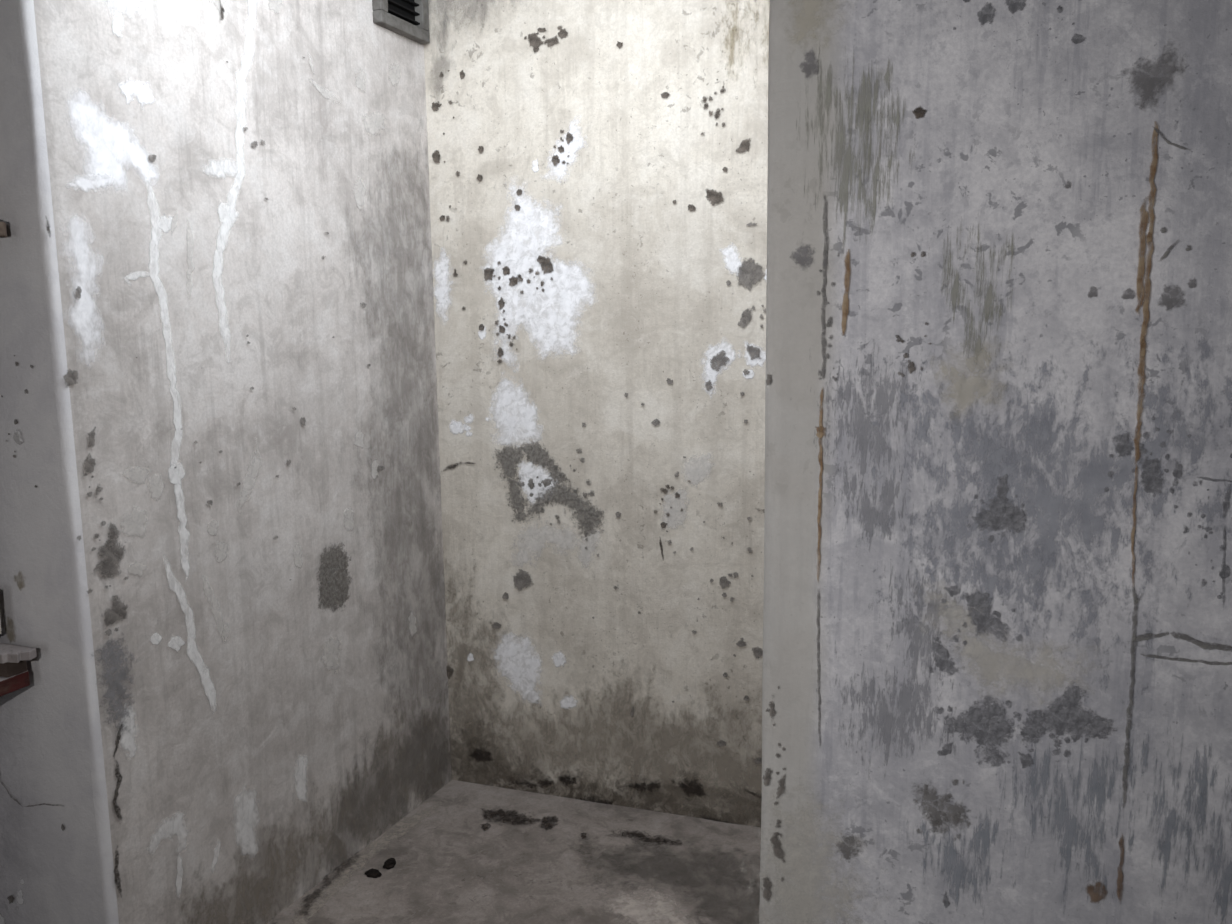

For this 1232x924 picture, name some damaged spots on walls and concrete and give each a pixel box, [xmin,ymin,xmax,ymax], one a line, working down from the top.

leakage [70,174,113,191]
leakage [807,62,904,243]
leakage [69,218,103,361]
corrosion [841,250,850,335]
leakage [944,238,1013,386]
corrosion [1131,122,1158,583]
corrosion [816,389,824,579]
leakage [825,341,1213,765]
leakage [190,582,762,924]
leakage [914,780,998,903]
leakage [1014,742,1232,922]
crack [1122,587,1232,807]